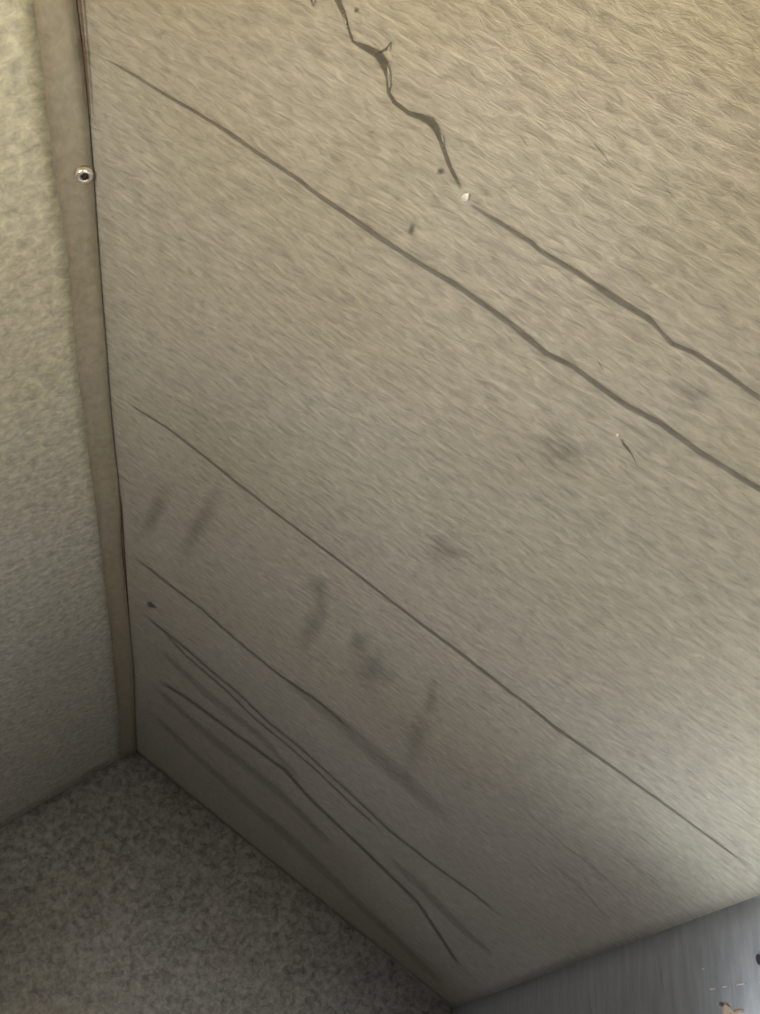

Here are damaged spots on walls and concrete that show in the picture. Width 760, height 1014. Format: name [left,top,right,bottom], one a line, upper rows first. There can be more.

crack [311,0,469,202]